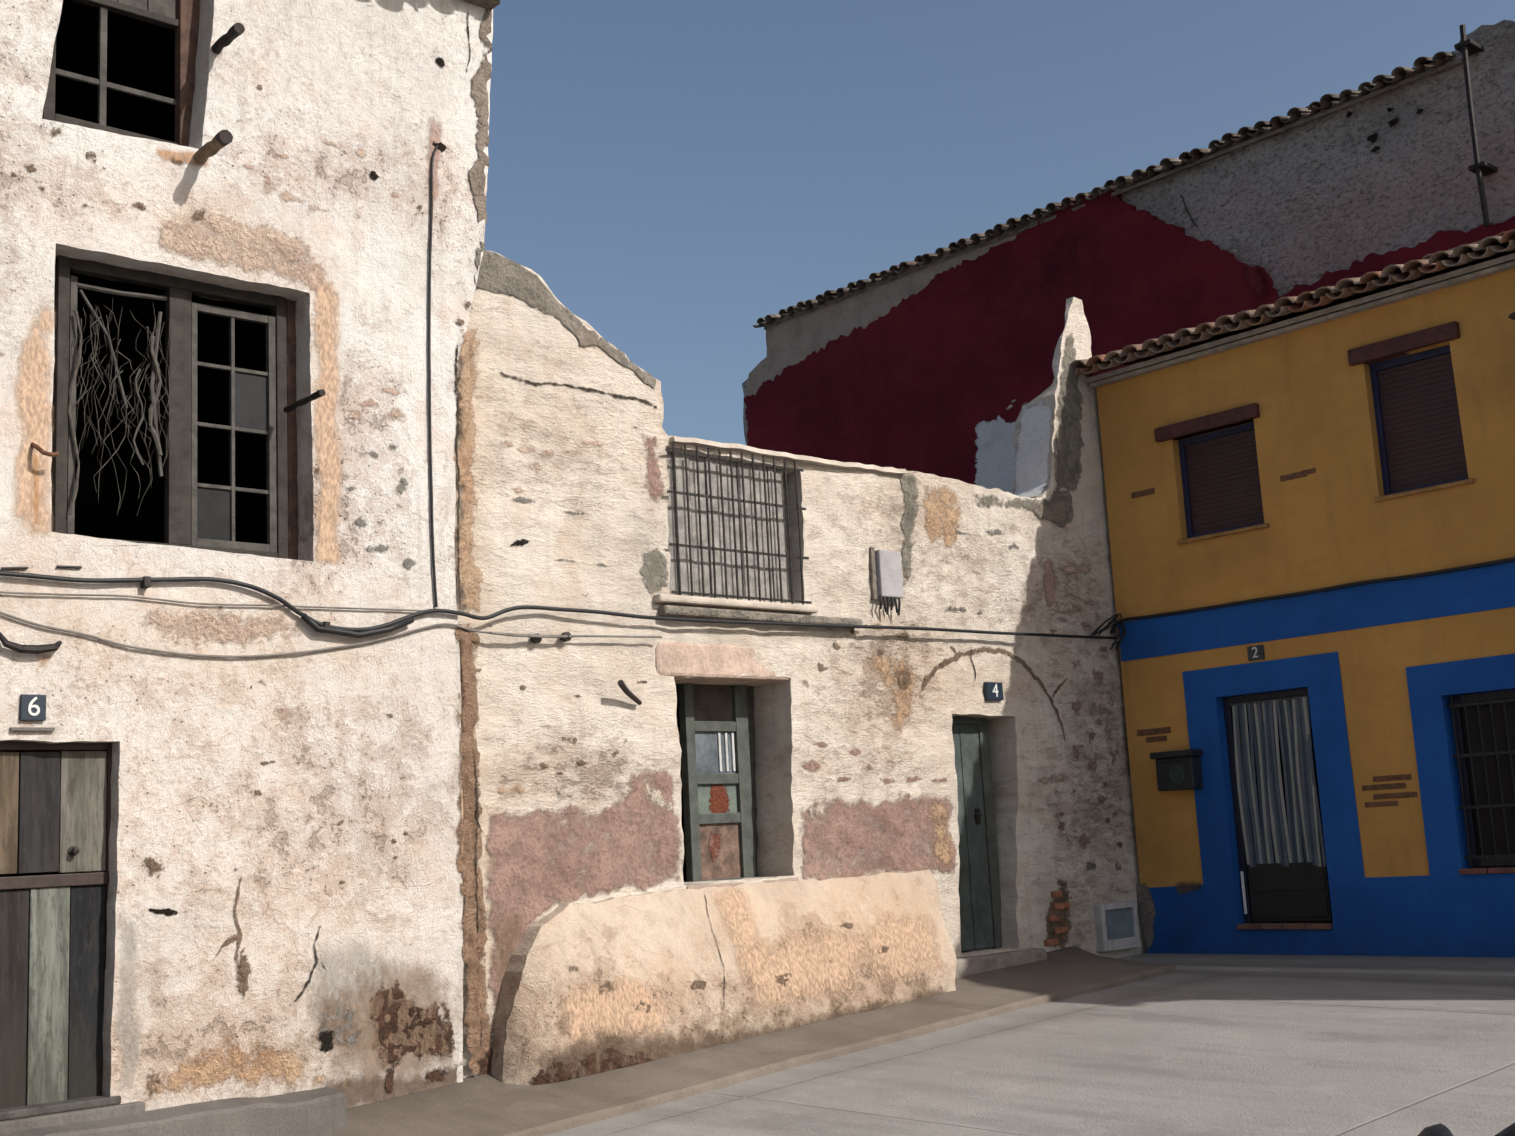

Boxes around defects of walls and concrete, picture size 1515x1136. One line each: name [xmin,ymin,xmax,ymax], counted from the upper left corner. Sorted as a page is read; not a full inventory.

flaking render [469,8,492,224]
flaking render [158,208,324,291]
flaking render [747,173,1148,396]
crack [500,372,657,409]
crack [453,345,461,609]
spalling [900,333,1085,586]
flaking render [317,242,682,1093]
crack [921,646,1068,740]
flaking render [802,749,957,881]
flaking render [149,908,179,916]
crack [217,878,249,996]
crack [290,925,327,1005]